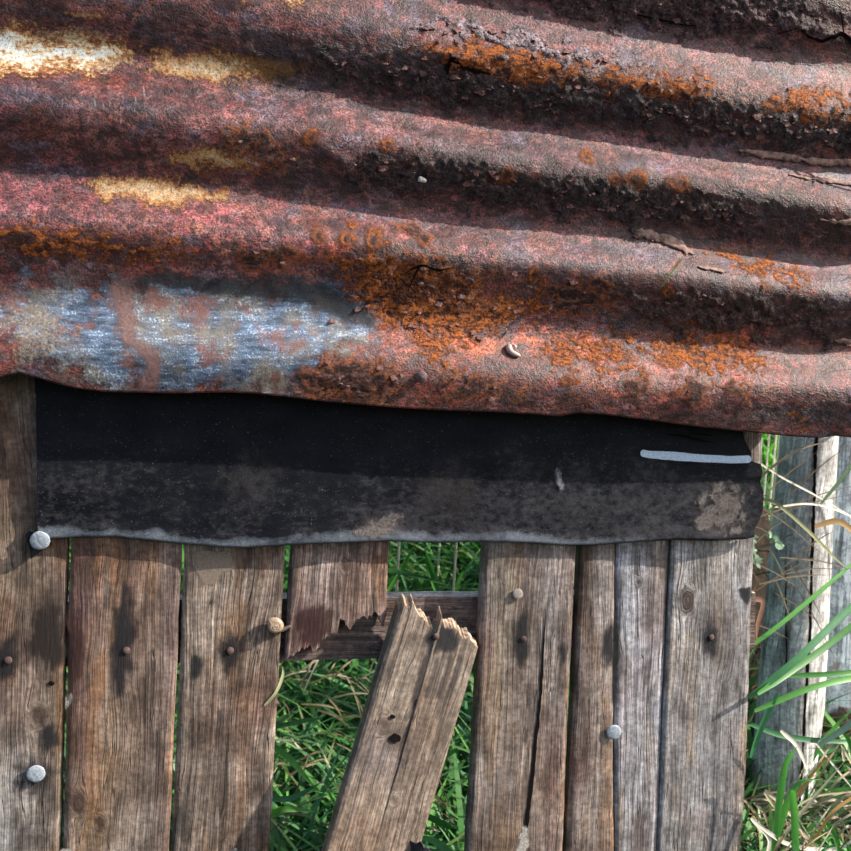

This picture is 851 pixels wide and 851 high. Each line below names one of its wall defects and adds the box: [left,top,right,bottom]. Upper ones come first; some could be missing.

corrosion [205,119,299,175]
corrosion [286,0,851,186]
crack [768,13,851,45]
corrosion [0,218,198,266]
corrosion [235,137,851,407]
crack [785,438,818,808]
crack [524,609,546,833]